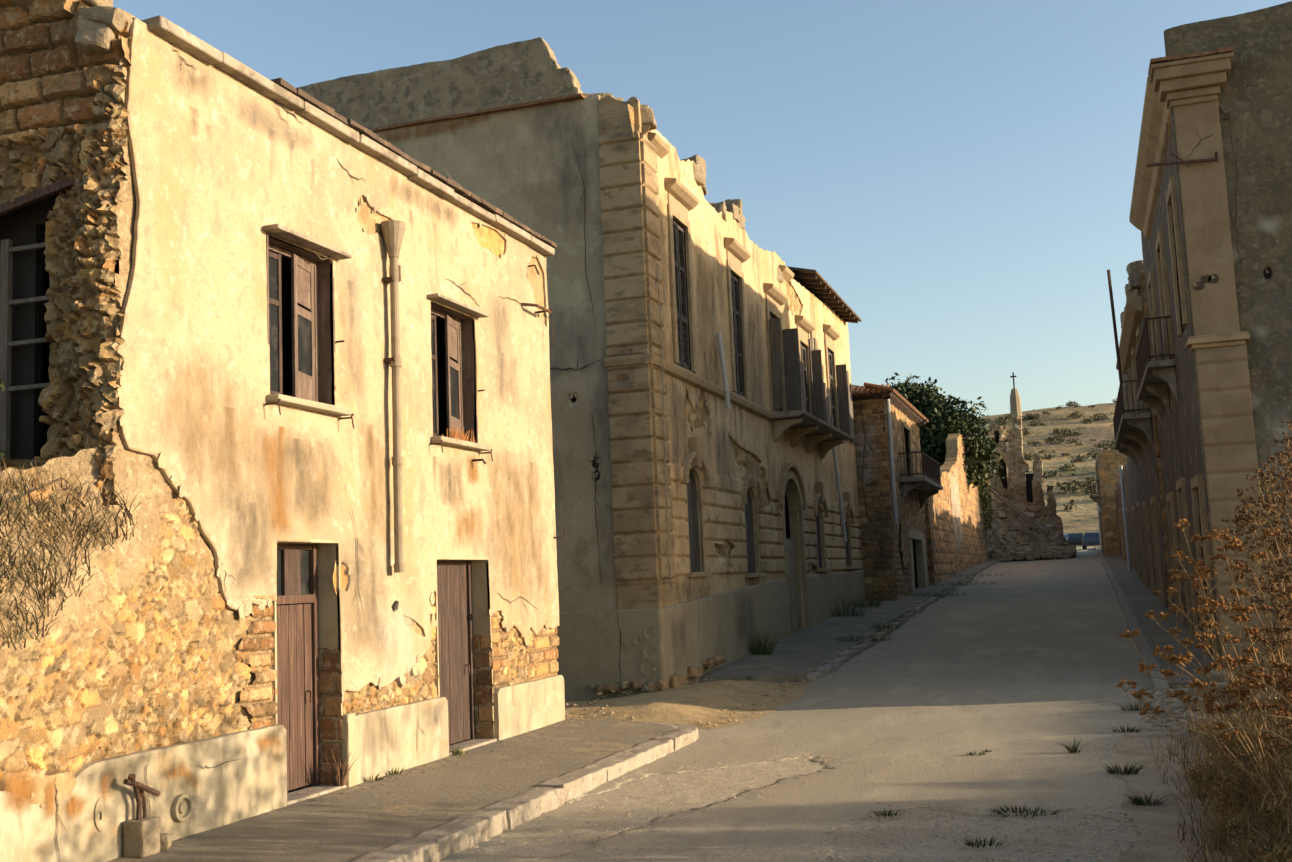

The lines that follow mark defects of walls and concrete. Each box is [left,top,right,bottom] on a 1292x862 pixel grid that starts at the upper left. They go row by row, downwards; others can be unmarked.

spalling [355,196,389,237]
spalling [472,223,506,261]
crack [571,140,595,324]
crack [1190,121,1244,282]
flaking render [110,342,126,358]
crack [549,335,601,370]
flaking render [157,452,185,498]
flaking render [226,599,273,620]
spalling [391,592,438,687]
corrosion [8,772,83,816]